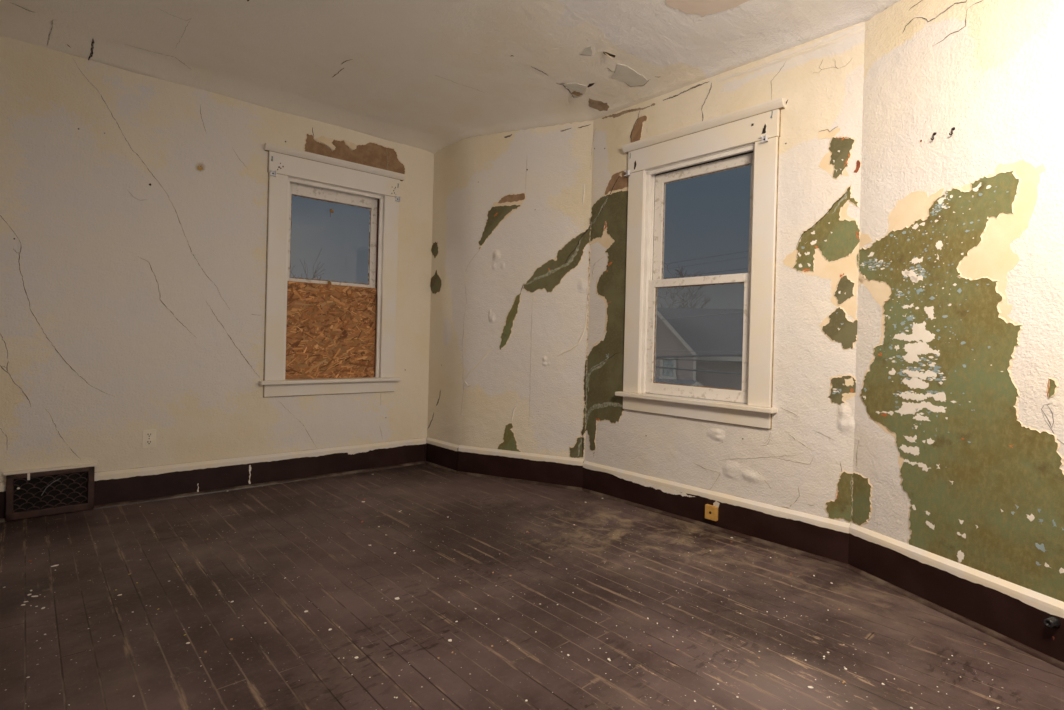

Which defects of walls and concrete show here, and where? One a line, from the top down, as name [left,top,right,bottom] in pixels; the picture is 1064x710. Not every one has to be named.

peeling [580,46,648,87]
peeling [665,0,749,16]
crack [903,0,983,45]
crack [0,333,81,459]
crack [0,215,115,396]
crack [12,3,260,378]
peeling [303,128,406,189]
peeling [478,193,526,251]
peeling [497,83,655,458]
peeling [783,126,1064,602]